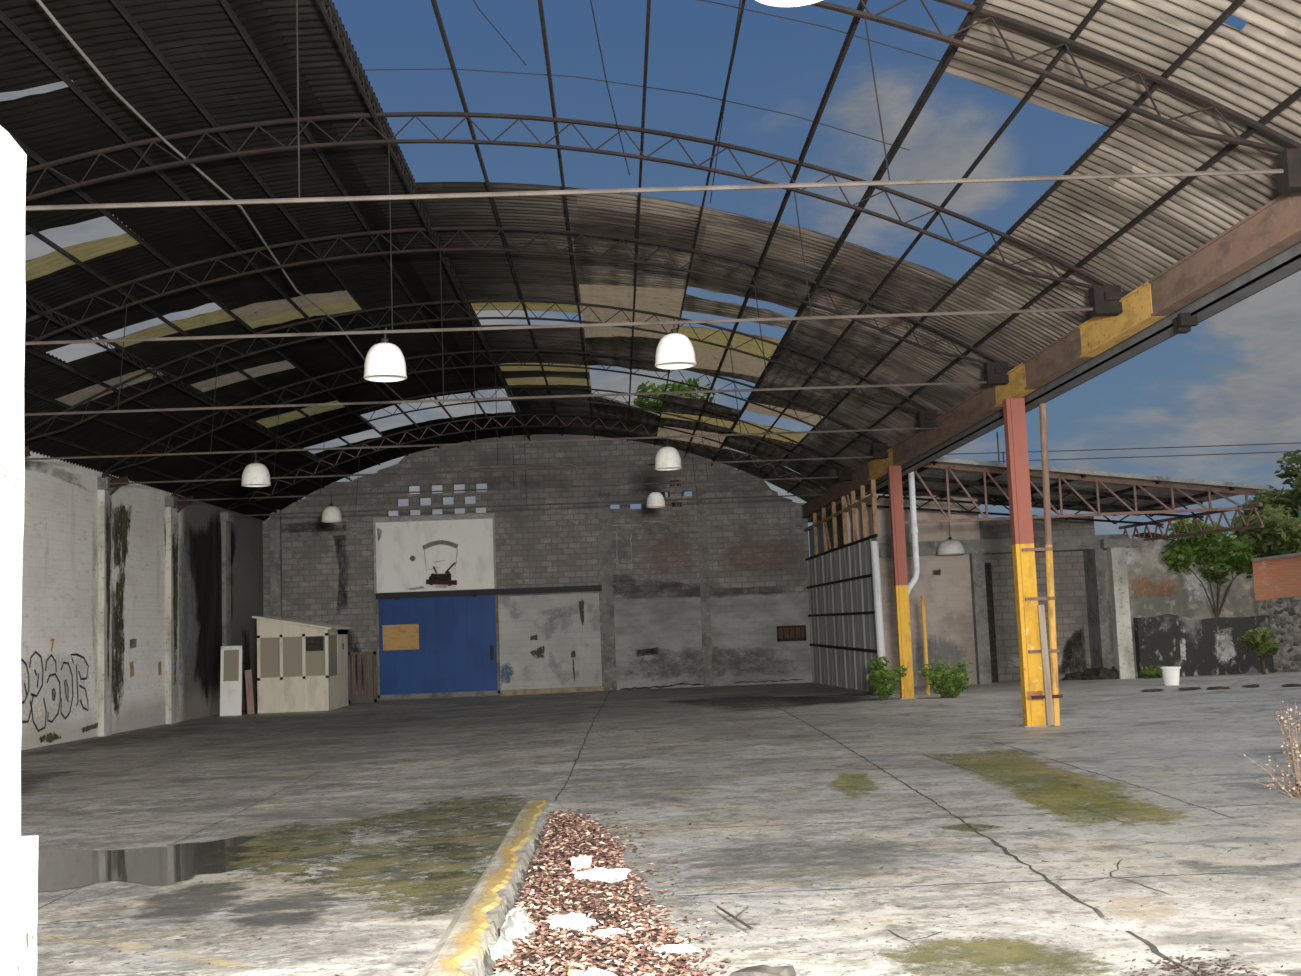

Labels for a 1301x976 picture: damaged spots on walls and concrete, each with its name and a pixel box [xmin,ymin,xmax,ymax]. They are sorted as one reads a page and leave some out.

damp [106,502,131,713]
damp [164,515,235,698]
damp [242,631,250,691]
crack [1085,859,1173,896]